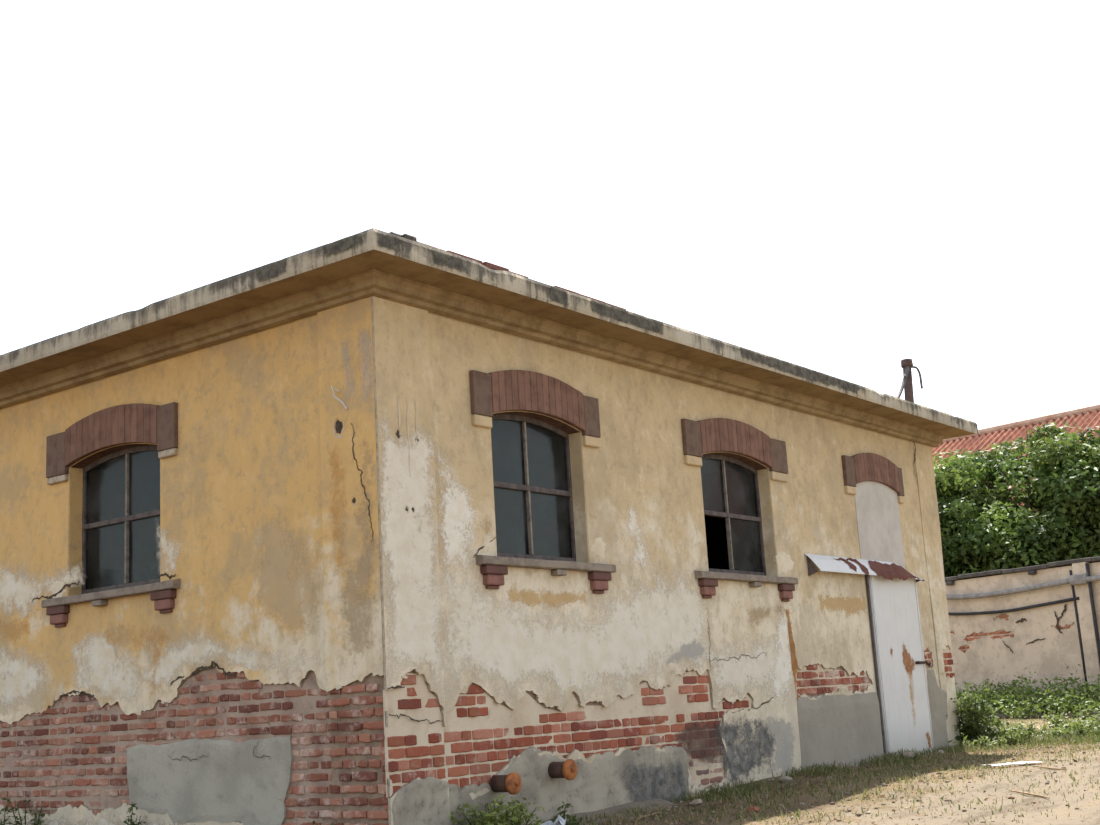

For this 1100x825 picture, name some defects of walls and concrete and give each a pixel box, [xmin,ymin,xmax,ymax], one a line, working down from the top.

crack [351,424,373,538]
corrosion [836,558,925,581]
flaking render [0,417,871,825]
crack [707,607,764,671]
corrosion [890,644,915,715]
flaking render [924,614,1014,678]
damp [717,717,794,784]